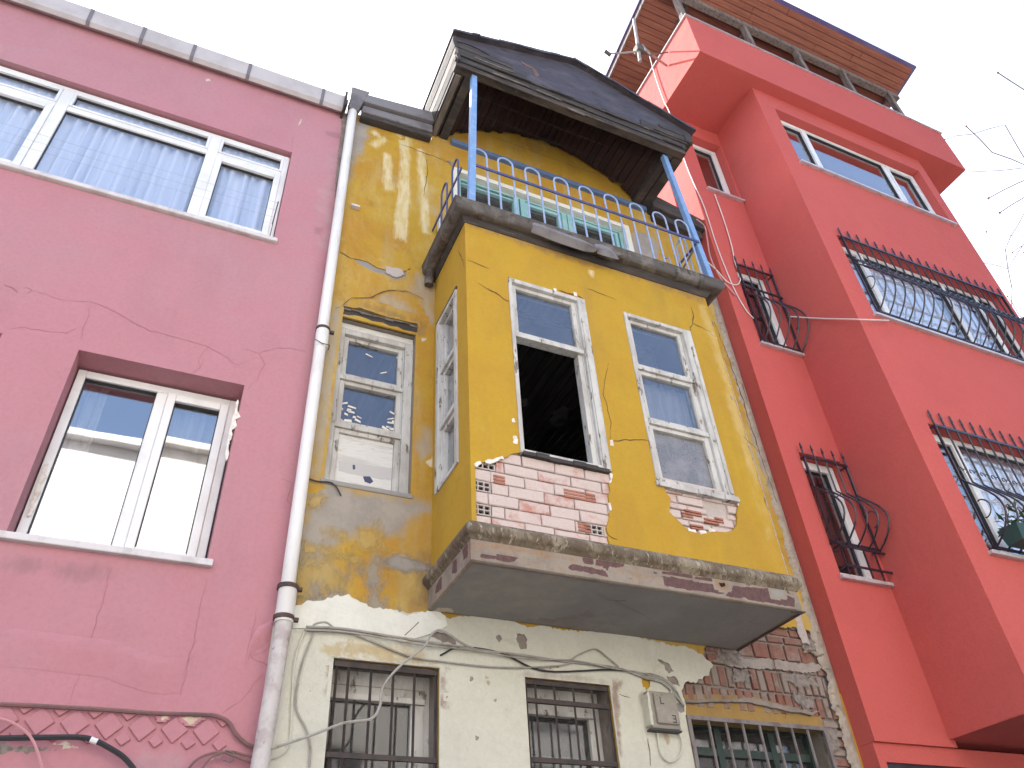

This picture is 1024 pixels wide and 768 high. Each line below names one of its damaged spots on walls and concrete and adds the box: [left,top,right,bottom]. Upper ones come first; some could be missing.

crack [337,290,423,308]
crack [6,285,306,382]
crack [603,367,648,441]
spalling [474,418,613,544]
spalling [645,297,862,768]
peeling [434,542,538,597]
peeling [564,557,636,582]
peeling [0,733,90,760]
peeling [156,716,206,726]